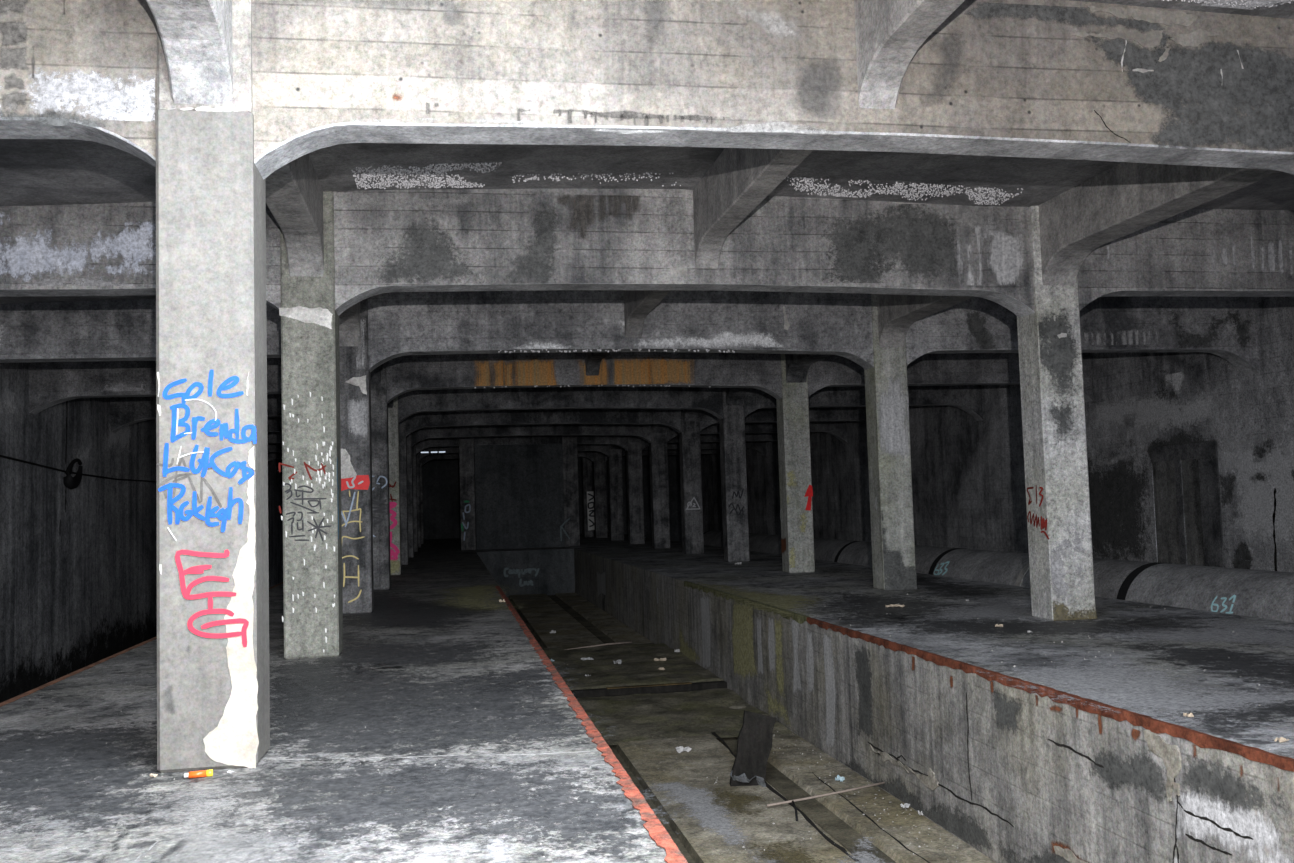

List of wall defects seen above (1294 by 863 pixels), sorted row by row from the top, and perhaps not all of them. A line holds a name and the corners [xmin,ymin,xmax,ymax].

leakage [1189,0,1294,10]
leakage [0,0,155,127]
leakage [965,2,1294,150]
leakage [378,218,473,283]
leakage [504,195,638,284]
spalling [203,447,259,768]
crack [1172,778,1253,863]